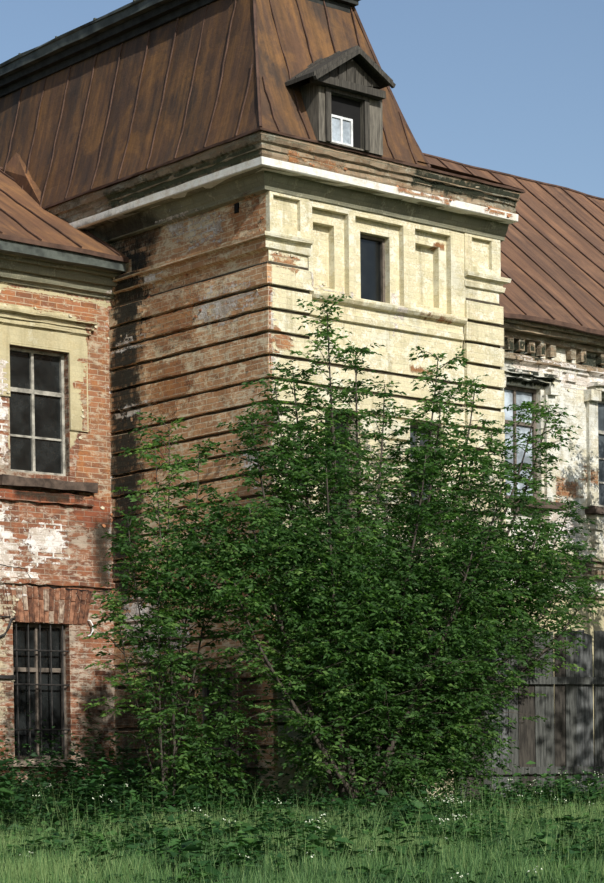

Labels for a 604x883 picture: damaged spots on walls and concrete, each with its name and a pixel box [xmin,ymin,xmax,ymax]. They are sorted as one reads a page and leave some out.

spalling [229,194,264,235]
leakage [83,206,225,620]
spalling [141,274,210,479]
leakage [190,276,276,338]
spalling [268,251,300,420]
peeling [512,352,604,395]
flaking render [0,286,114,730]
peeling [539,466,598,546]
crack [0,564,102,604]